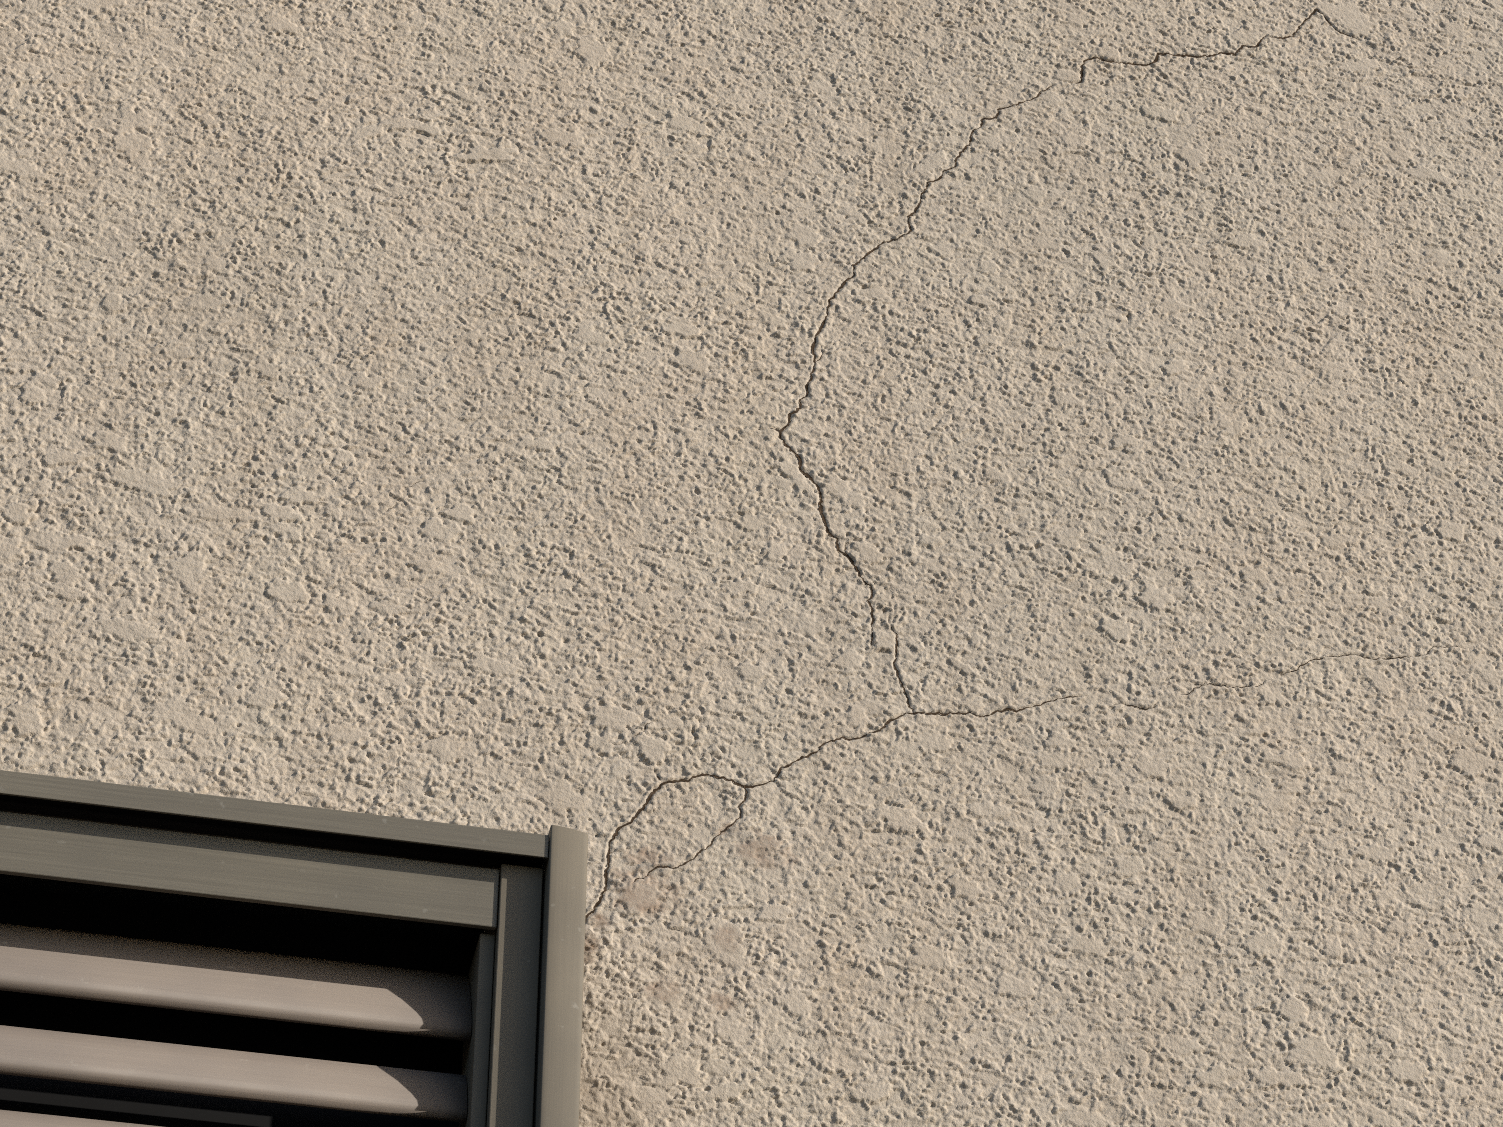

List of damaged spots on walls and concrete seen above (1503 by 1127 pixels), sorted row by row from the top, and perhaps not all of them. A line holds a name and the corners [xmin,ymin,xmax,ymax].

crack [585,9,1359,921]
crack [1114,646,1466,710]